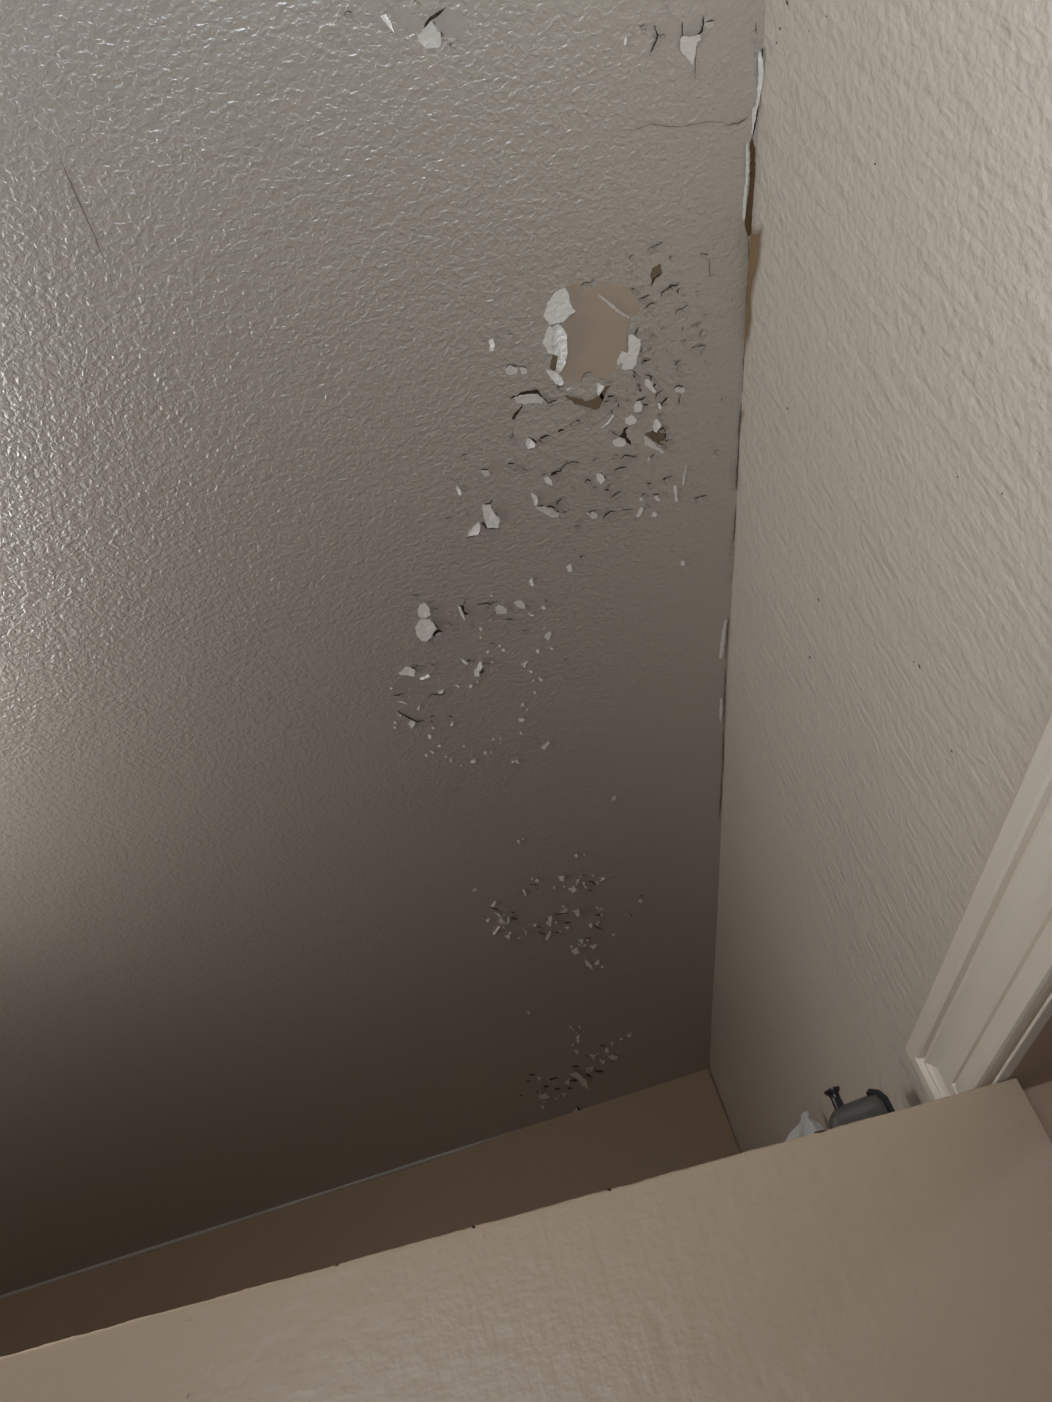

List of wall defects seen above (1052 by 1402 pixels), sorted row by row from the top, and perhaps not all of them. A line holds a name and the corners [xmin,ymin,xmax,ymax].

peeling [344,0,466,50]
peeling [624,1,715,79]
peeling [462,242,716,533]
peeling [446,493,509,543]
peeling [390,595,573,771]
peeling [481,875,615,969]
peeling [519,1026,631,1110]